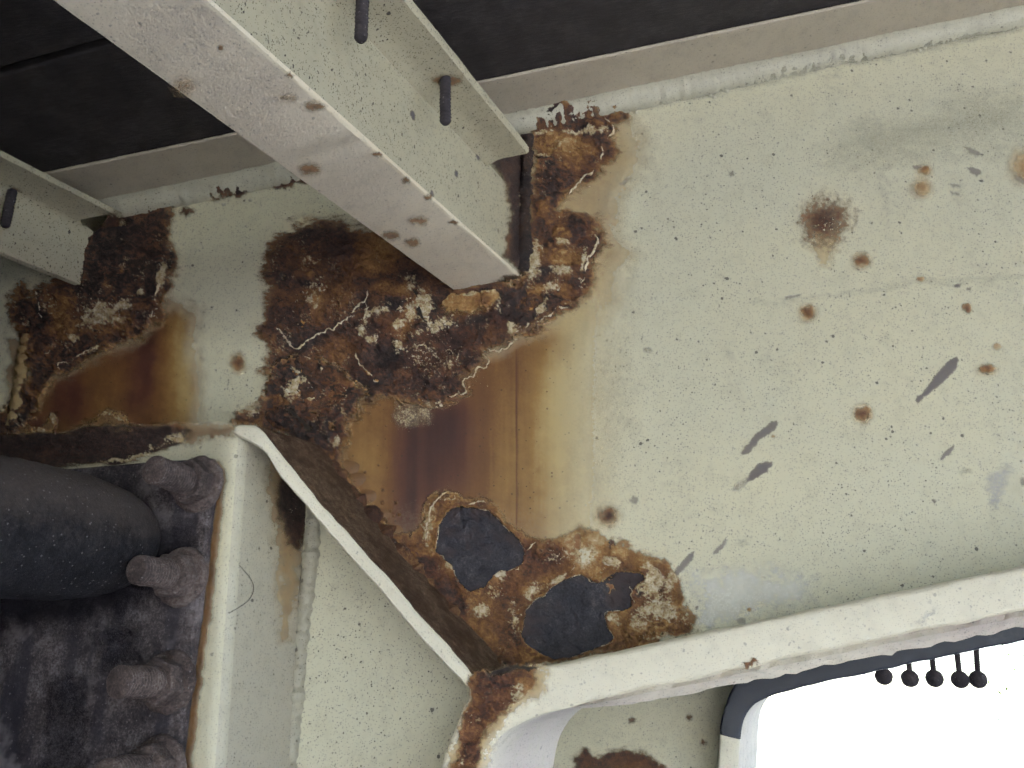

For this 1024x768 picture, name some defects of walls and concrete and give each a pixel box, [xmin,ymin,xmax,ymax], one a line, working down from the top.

corrosion [284,95,325,111]
corrosion [797,196,849,261]
corrosion [855,254,869,265]
corrosion [801,306,814,319]
corrosion [0,100,697,768]
corrosion [855,406,871,421]
peeling [436,506,525,592]
peeling [521,571,644,660]